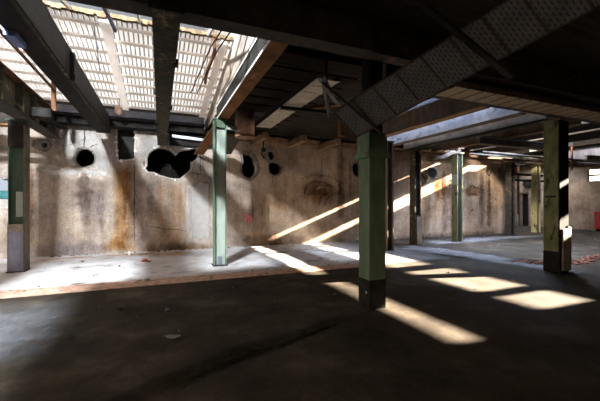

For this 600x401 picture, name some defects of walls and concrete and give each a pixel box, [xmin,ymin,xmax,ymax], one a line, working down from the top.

peeling [43,133,106,176]
spalling [114,129,200,181]
hole [240,150,284,180]